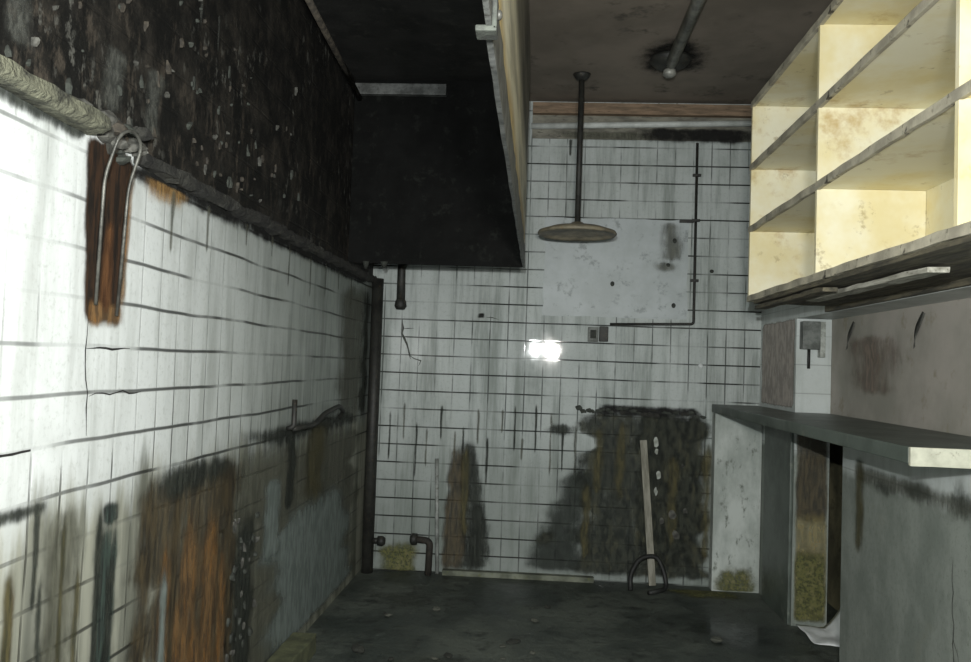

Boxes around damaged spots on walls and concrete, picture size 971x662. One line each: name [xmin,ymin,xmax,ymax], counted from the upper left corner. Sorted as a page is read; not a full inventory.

damp [106,50,123,108]
damp [147,73,163,131]
rust [85,139,132,325]
damp [0,503,79,662]
damp [90,503,118,662]
rust [127,458,236,662]
damp [442,411,489,570]
damp [501,406,537,458]
damp [531,405,712,579]
damp [855,461,971,549]